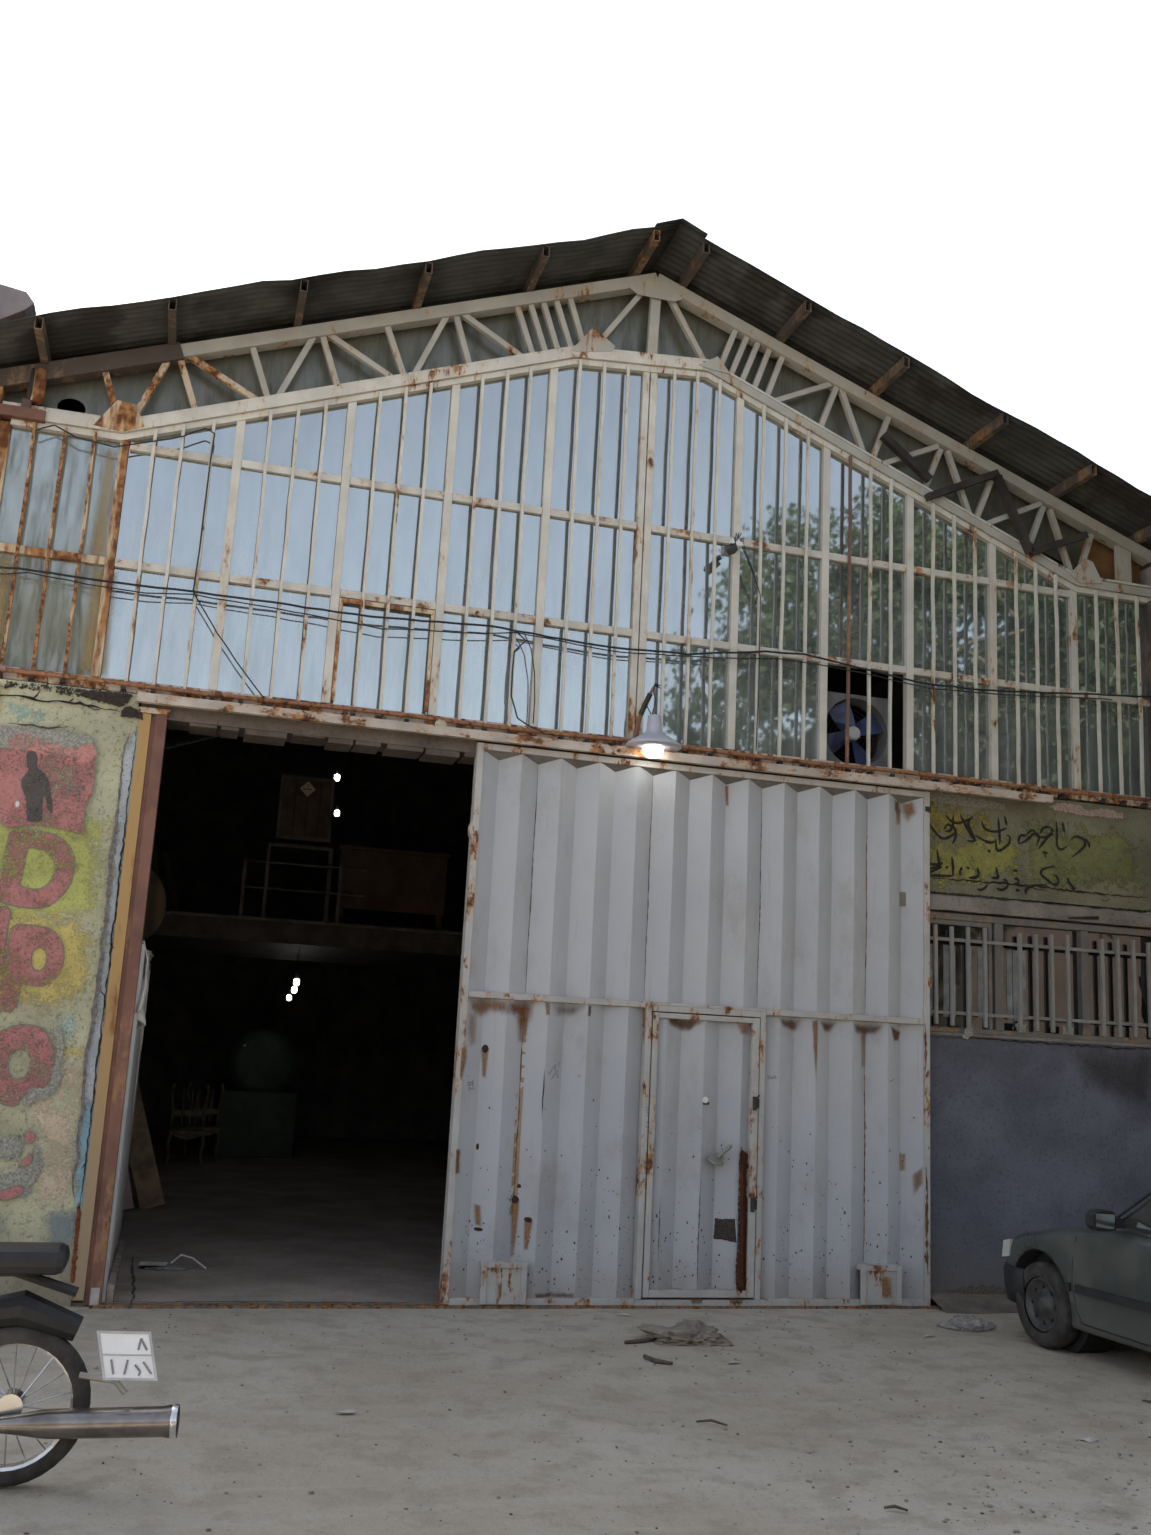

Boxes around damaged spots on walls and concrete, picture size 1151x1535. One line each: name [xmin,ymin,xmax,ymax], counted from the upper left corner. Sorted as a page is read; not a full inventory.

spalling [0,680,143,720]
peeling [0,725,99,763]
corrosion [471,1001,591,1213]
corrosion [673,1147,749,1303]
corrosion [882,1278,891,1297]